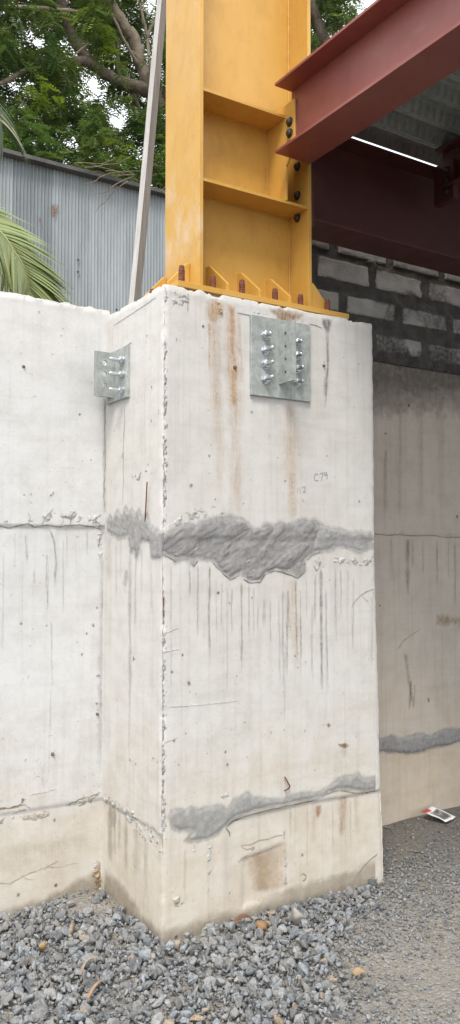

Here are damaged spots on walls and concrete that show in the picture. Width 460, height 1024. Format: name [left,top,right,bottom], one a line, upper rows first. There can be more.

crack [0,404,125,546]
crack [374,530,460,538]
spalling [67,568,167,853]
crack [0,779,100,810]
spalling [0,809,50,827]